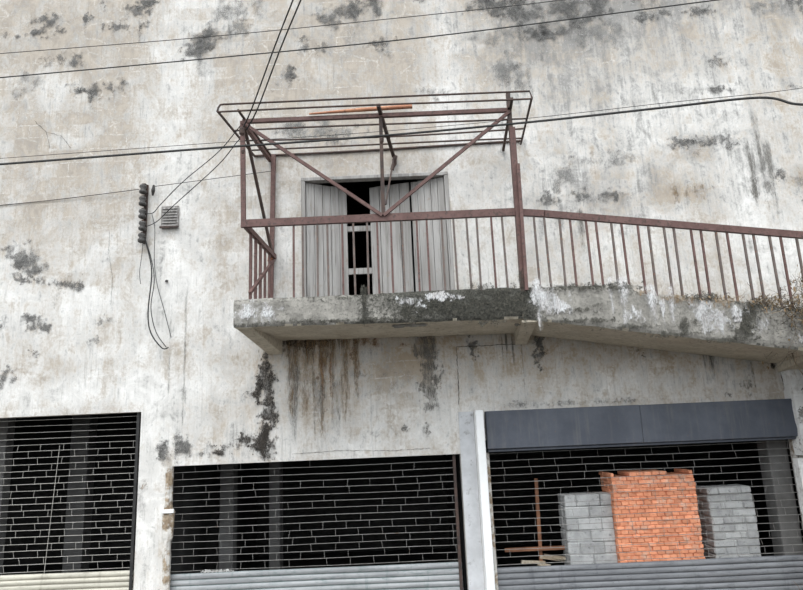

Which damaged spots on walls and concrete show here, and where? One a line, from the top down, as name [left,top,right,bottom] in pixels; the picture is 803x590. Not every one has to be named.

mould [181,5,248,61]
mould [467,0,613,47]
mould [495,51,530,90]
leakage [672,134,785,196]
leakage [1,240,84,291]
mould [22,313,51,333]
leakage [156,352,279,461]
leakage [283,338,376,430]
leakage [402,336,444,406]